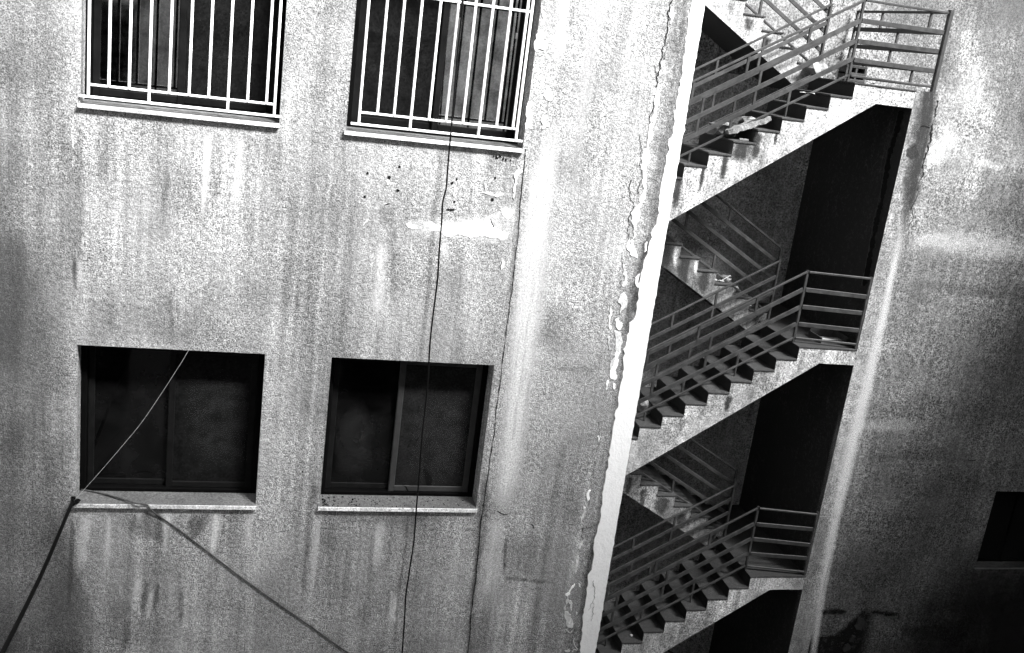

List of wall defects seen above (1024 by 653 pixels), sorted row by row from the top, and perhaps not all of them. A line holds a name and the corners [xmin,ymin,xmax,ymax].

water stain [202,139,210,203]
peeling [606,89,660,390]
crack [619,0,673,286]
water stain [163,515,171,547]
water stain [191,514,220,551]
crack [467,149,526,653]